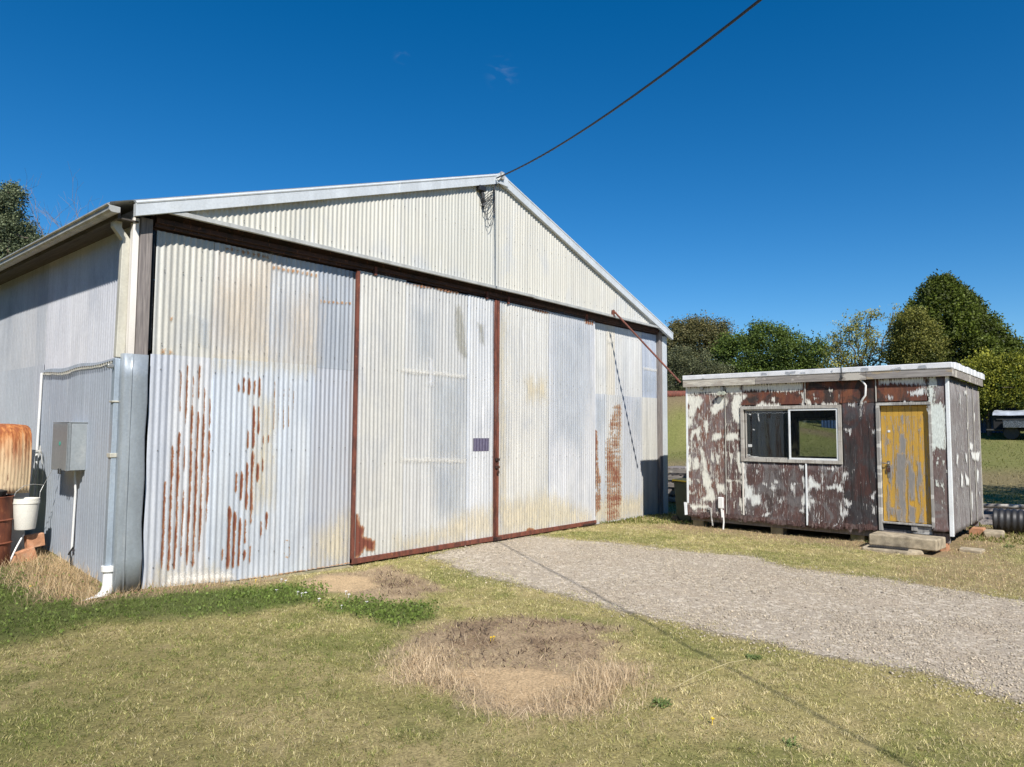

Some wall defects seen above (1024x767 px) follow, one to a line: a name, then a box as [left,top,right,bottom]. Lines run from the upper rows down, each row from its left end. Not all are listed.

rust [160,365,211,570]
rust [221,377,294,570]
rust [240,514,376,581]
rust [595,402,622,521]
peeling [686,365,983,533]